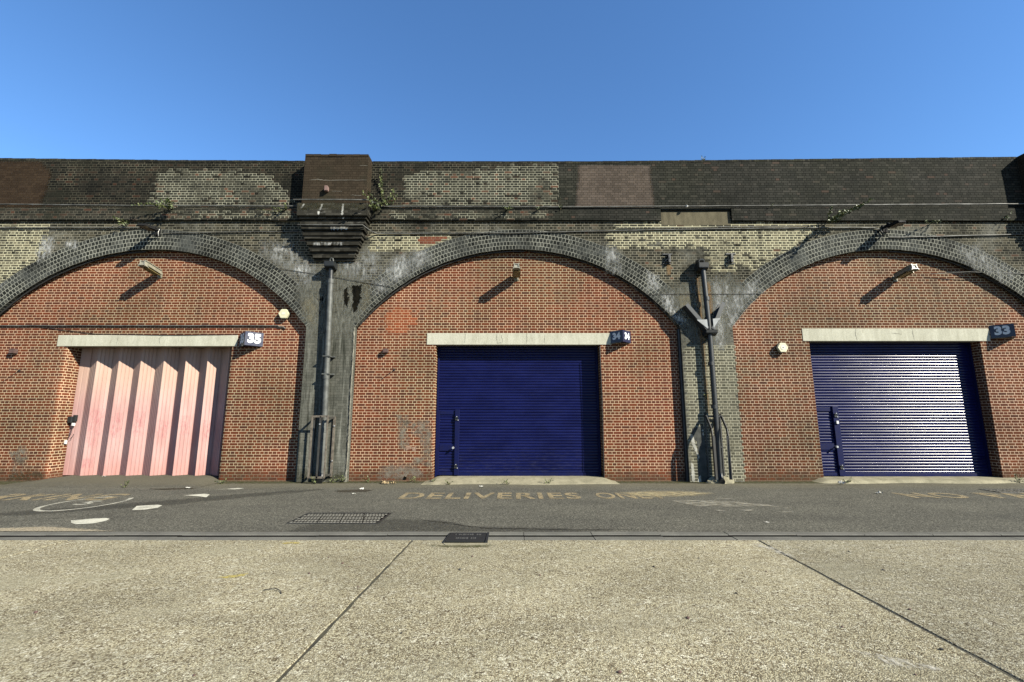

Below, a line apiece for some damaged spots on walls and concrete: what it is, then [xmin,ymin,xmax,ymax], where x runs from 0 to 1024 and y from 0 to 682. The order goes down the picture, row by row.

leakage [264,246,428,335]